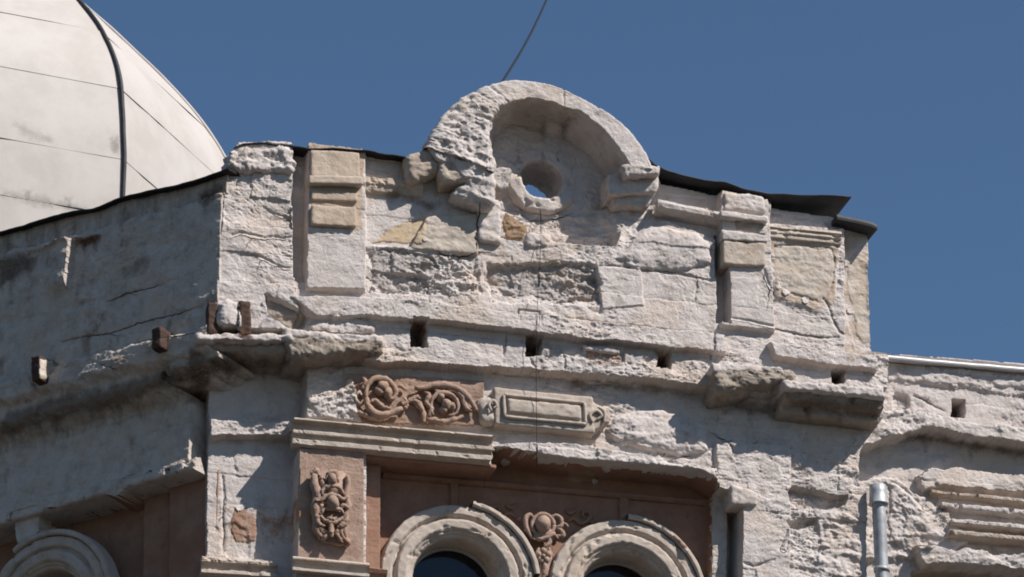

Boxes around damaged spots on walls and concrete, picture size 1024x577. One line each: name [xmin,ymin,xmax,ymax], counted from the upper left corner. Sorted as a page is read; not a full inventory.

spalling [367,216,442,294]
spalling [488,260,601,304]
crack [62,307,196,343]
damp [2,351,271,432]